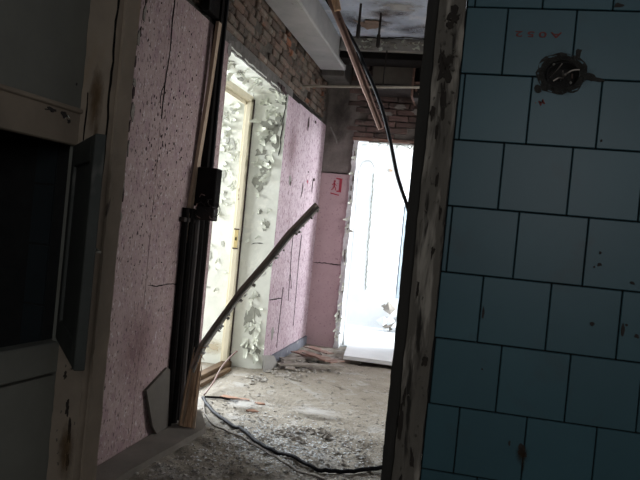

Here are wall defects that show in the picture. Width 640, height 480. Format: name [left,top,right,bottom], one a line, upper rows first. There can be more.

crack [160,0,175,119]
peeling [217,101,242,218]
peeling [226,43,287,199]
spalling [534,49,605,95]
crack [270,235,338,348]
peeling [333,275,345,341]